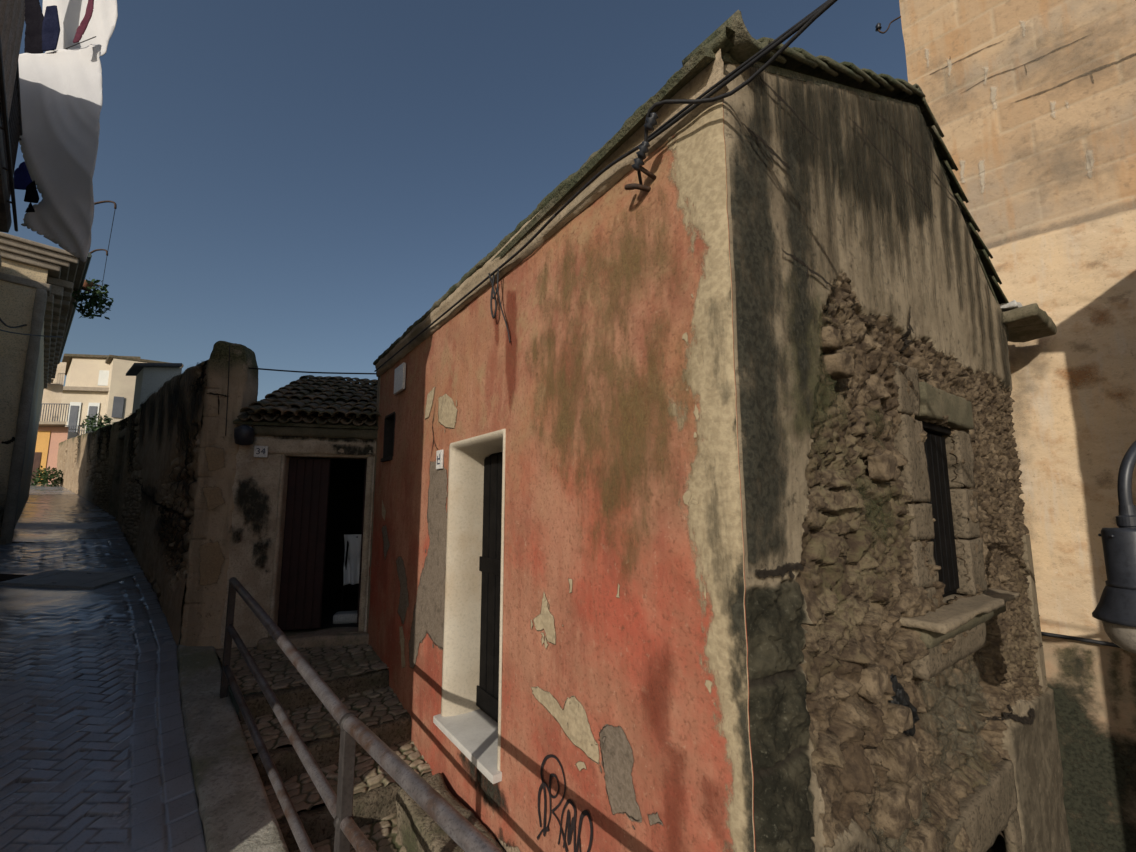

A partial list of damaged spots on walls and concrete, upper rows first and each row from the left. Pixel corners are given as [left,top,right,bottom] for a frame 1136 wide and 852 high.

leakage [231,478,270,572]
flaking render [382,458,447,668]
peeling [425,387,457,433]
leakage [494,292,516,399]
peeling [531,592,563,648]
leakage [533,333,668,506]
leakage [723,63,1011,852]
flaking render [796,272,1051,852]
flaking render [531,686,663,830]
leakage [1047,652,1136,852]